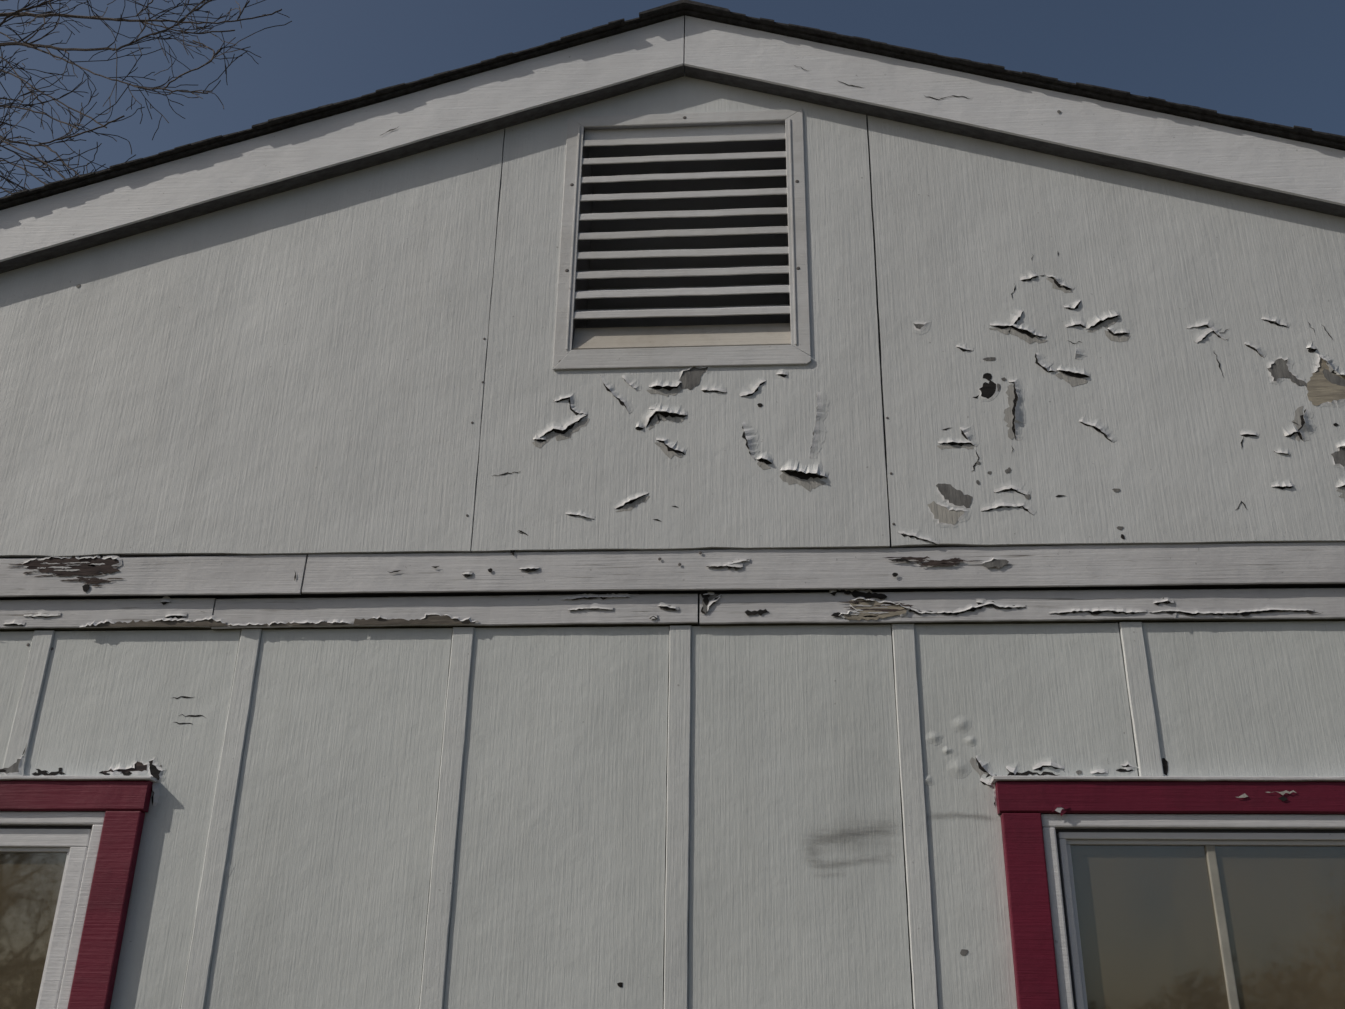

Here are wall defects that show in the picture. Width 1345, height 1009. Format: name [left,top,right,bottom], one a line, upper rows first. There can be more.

peeling [647,366,711,397]
peeling [956,342,1006,401]
peeling [1265,341,1345,408]
peeling [1331,439,1345,501]
peeling [927,484,972,528]
peeling [9,555,125,592]
peeling [882,556,1009,577]
peeling [78,612,477,628]
peeling [829,589,937,621]
peeling [0,744,65,776]
peeling [99,756,167,807]
peeling [1005,755,1138,776]